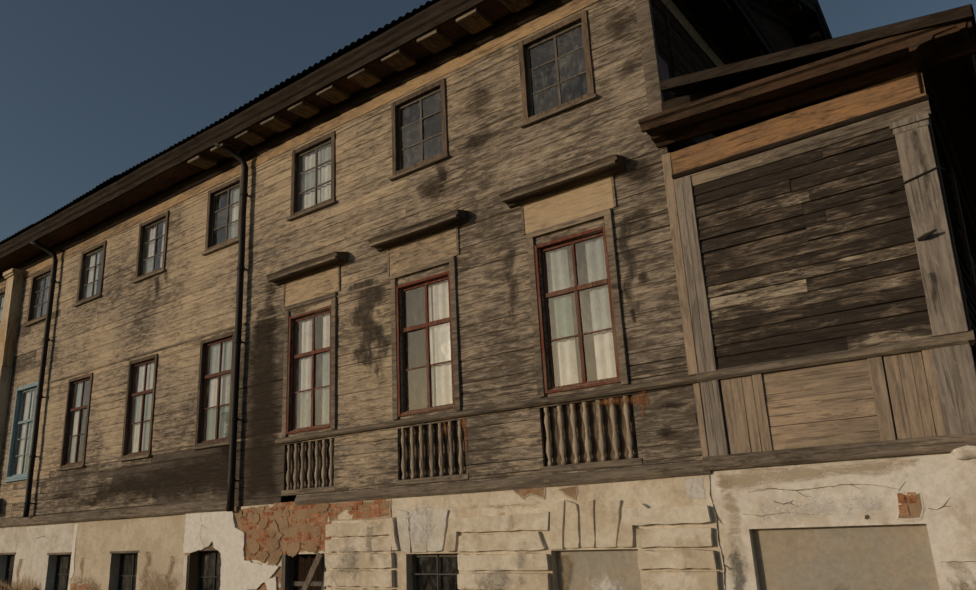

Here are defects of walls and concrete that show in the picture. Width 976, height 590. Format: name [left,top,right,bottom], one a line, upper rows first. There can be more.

damp [349,278,388,374]
damp [245,282,279,497]
damp [79,412,229,505]
flaking render [182,499,392,590]
crack [709,474,734,590]
crack [747,484,904,517]
flaking render [896,491,926,522]